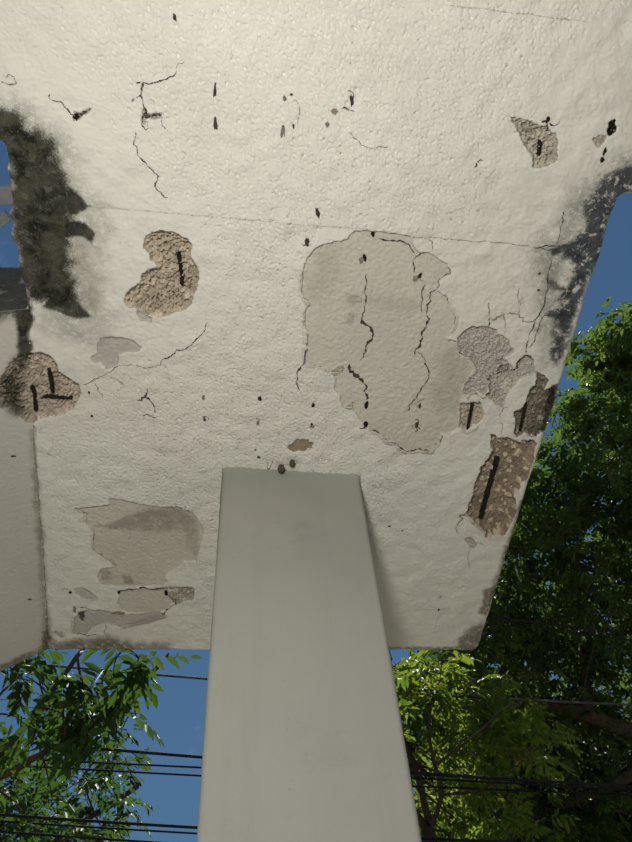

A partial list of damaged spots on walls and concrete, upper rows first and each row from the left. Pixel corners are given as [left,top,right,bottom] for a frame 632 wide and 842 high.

spalling [0,352,82,423]
mould [0,109,94,357]
crack [133,133,167,198]
crack [132,63,182,108]
spalling [124,230,199,322]
peeling [287,439,313,452]
crack [331,274,374,429]
peeling [298,231,558,566]
crack [380,212,564,410]
spalling [511,116,560,168]
leakage [547,166,632,362]
peeling [61,499,204,638]